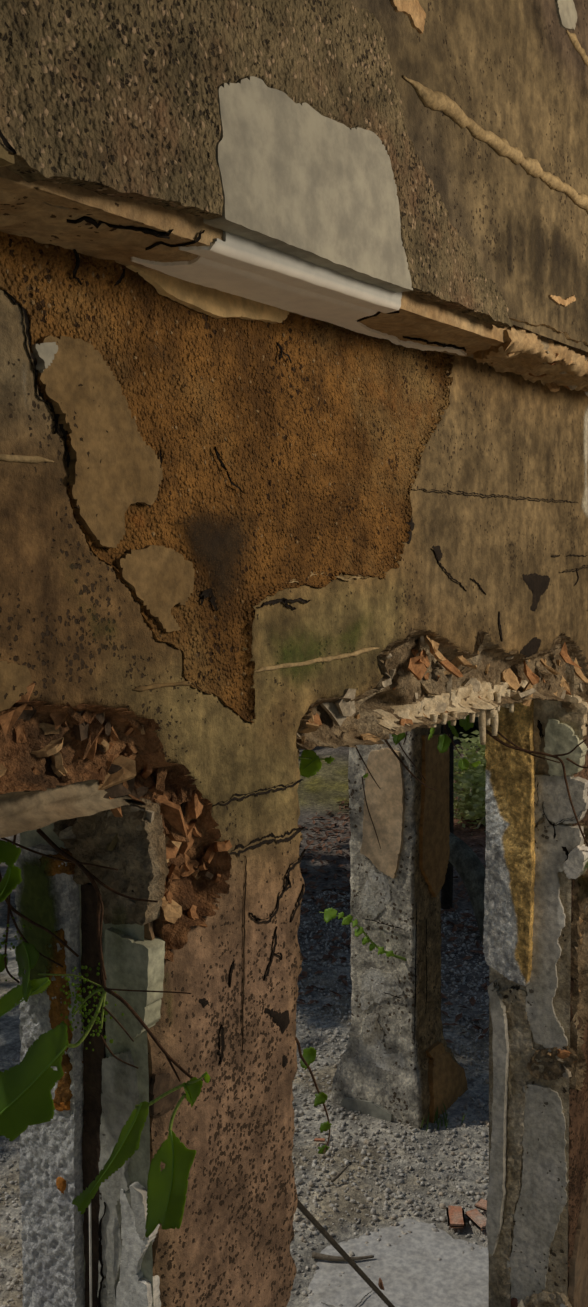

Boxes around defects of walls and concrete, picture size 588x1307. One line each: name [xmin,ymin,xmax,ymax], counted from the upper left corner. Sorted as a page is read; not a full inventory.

crack [0,130,16,154]
crack [67,216,205,286]
peeling [0,0,513,328]
leakage [186,516,249,595]
spalling [0,231,455,723]
crack [431,548,503,642]
crack [212,779,302,807]
rust [46,929,83,1111]
spalling [0,661,232,1307]
crack [219,827,306,1065]
spalling [296,630,588,1307]